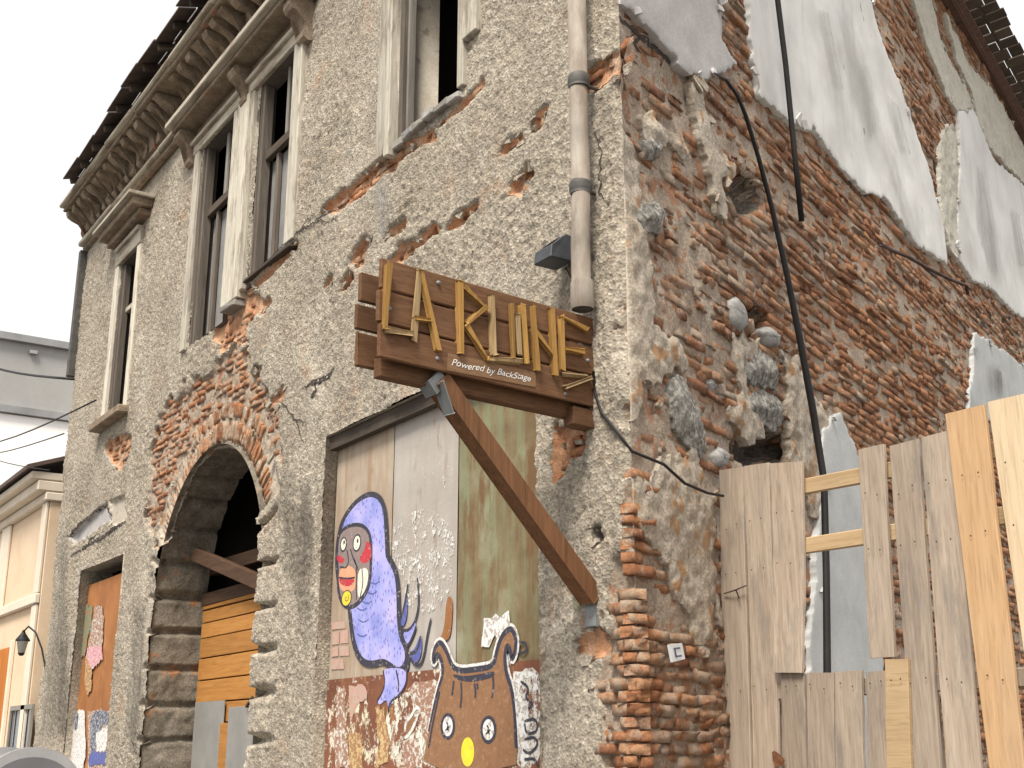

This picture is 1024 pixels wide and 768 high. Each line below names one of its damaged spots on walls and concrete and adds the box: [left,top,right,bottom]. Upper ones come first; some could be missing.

spalling [321,79,485,217]
peeling [587,0,1024,321]
crack [272,207,342,256]
spalling [325,202,481,293]
spalling [143,241,299,553]
crack [304,368,334,397]
peeling [965,332,1024,421]
spalling [729,432,783,466]
peeling [821,412,859,474]
peeling [811,485,863,537]
spalling [572,467,726,768]
peeling [804,546,884,678]